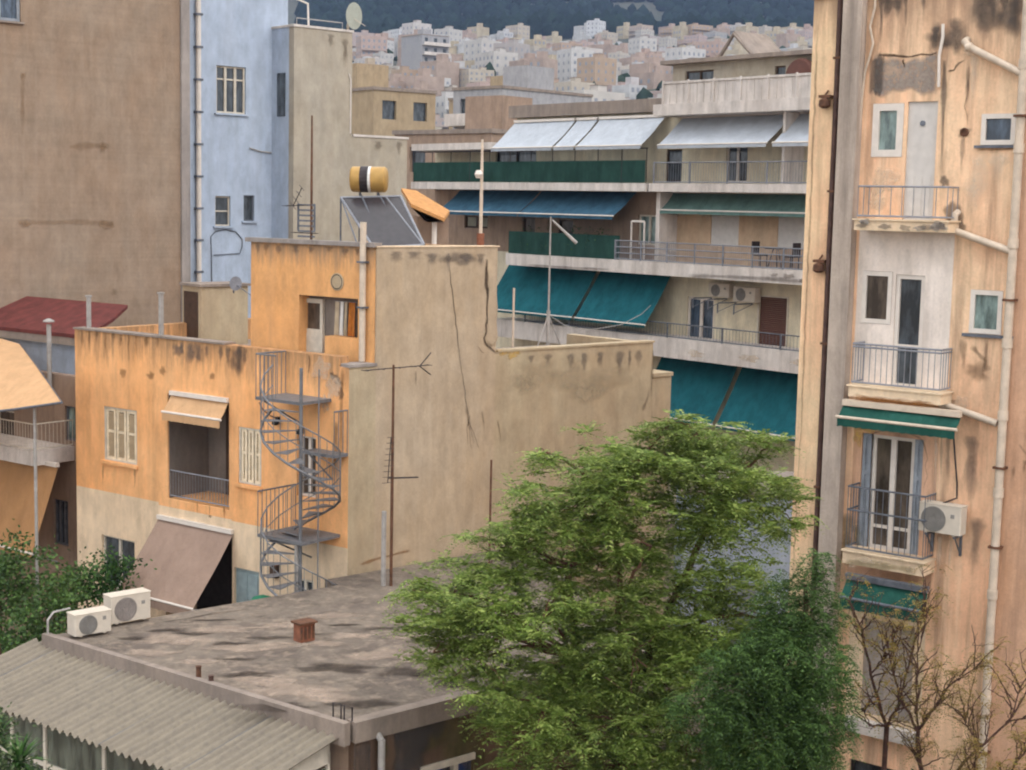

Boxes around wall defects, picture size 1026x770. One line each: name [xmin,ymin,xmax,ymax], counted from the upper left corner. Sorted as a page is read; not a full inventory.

crack [449,268,479,448]
crack [483,264,495,352]